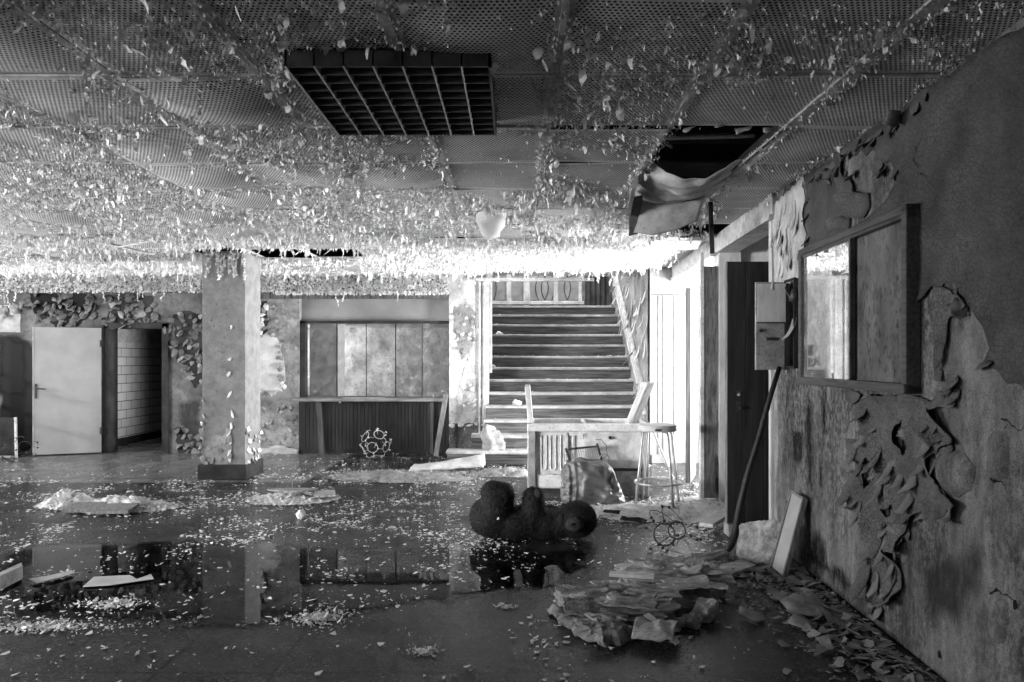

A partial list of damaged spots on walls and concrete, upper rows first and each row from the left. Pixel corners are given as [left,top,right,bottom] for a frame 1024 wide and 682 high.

peeling [0,0,1024,466]
peeling [0,453,537,585]
peeling [561,462,727,569]
peeling [833,375,960,625]
peeling [0,546,149,621]
peeling [10,585,225,682]
peeling [265,539,437,635]
peeling [508,614,588,682]